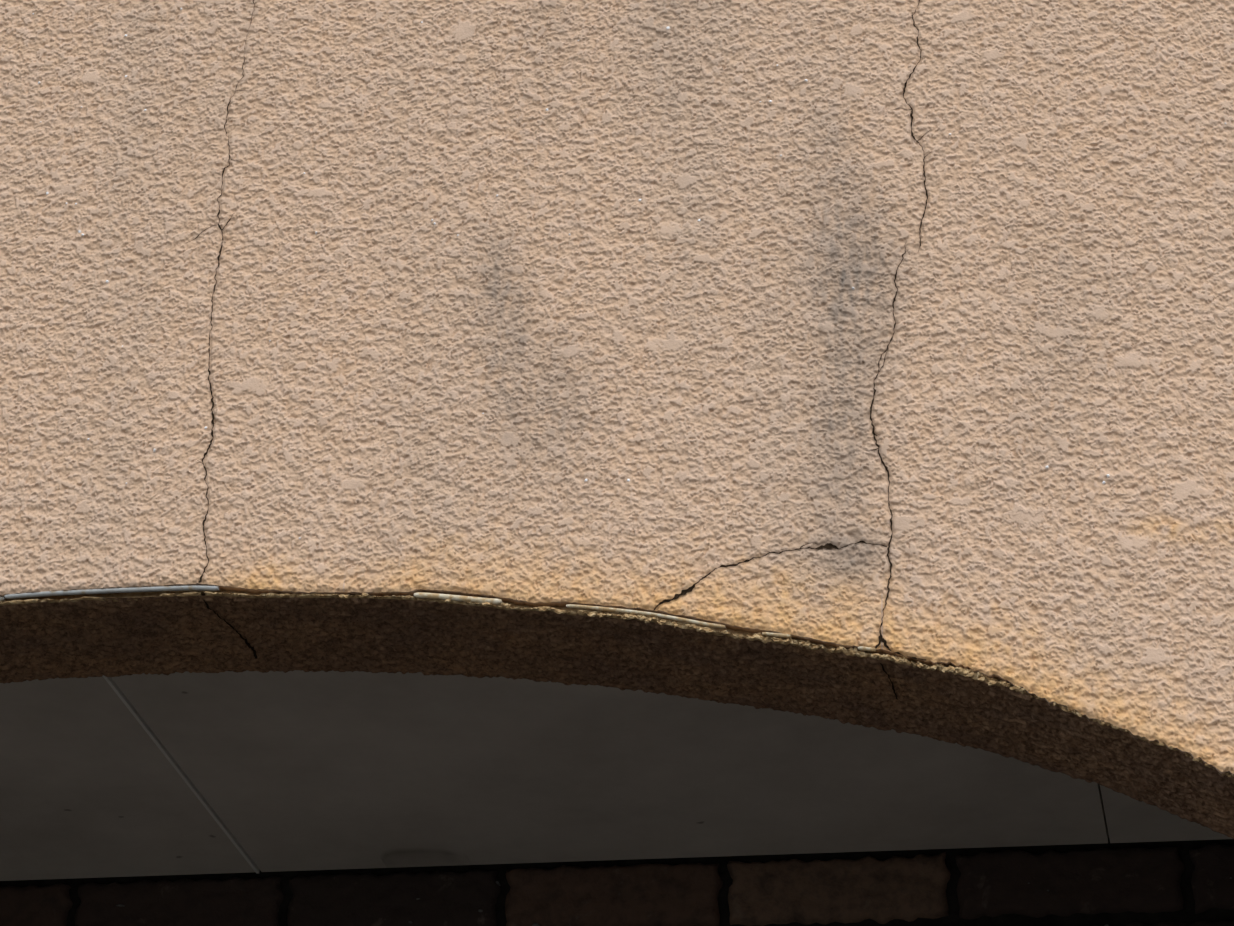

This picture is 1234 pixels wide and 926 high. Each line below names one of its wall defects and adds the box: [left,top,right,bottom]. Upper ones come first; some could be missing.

crack [187,0,257,659]
crack [653,0,931,699]